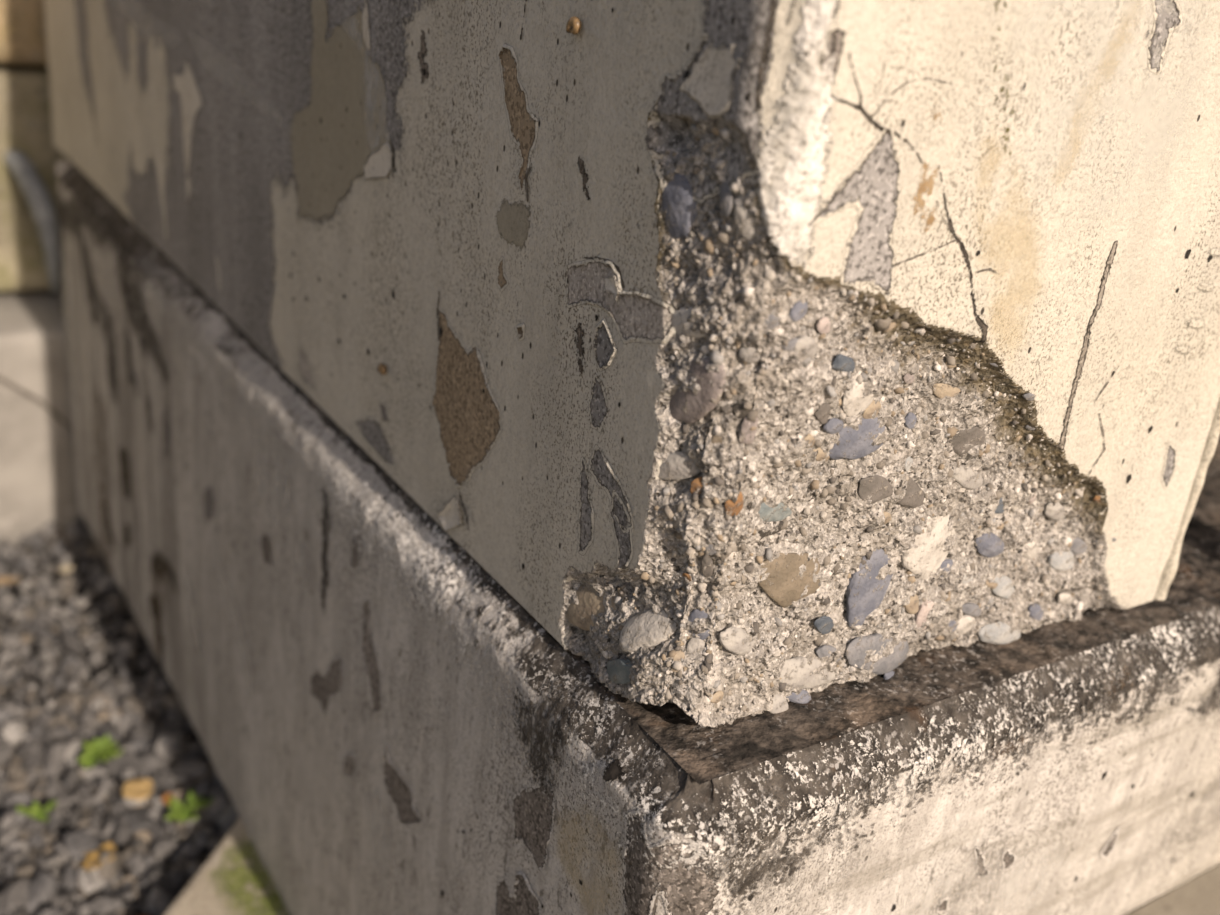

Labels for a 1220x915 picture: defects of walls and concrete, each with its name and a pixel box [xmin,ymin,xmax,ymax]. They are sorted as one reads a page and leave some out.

peeling [75,0,99,146]
peeling [104,0,434,369]
crack [755,0,796,111]
crack [808,0,996,343]
peeling [1148,0,1182,75]
peeling [432,306,502,532]
spalling [558,0,1126,727]
crack [1054,239,1119,475]
leakage [1067,611,1220,736]